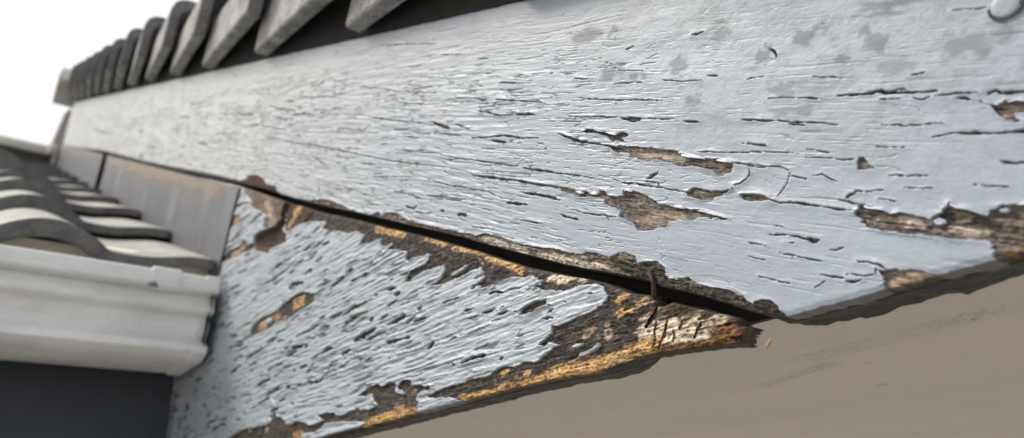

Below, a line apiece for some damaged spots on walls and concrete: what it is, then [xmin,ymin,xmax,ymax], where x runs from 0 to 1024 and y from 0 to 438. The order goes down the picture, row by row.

crack [576,71,699,123]
crack [839,91,1024,101]
crack [238,82,609,224]
peeling [526,118,913,231]
crack [745,98,928,204]
crack [940,129,1024,137]
peeling [309,197,577,254]
peeling [949,202,989,216]
peeling [861,262,957,294]
peeling [250,291,315,338]
peeling [521,300,547,315]
peeling [359,376,426,409]